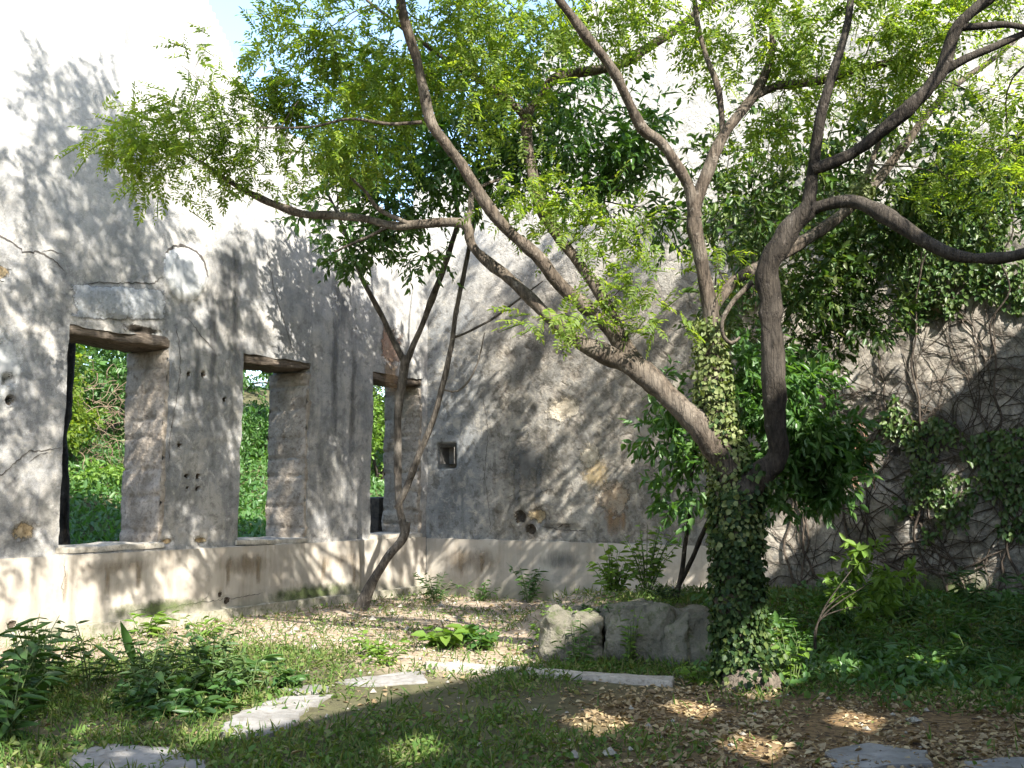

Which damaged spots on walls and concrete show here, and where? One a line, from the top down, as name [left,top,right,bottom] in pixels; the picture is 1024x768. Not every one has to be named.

crack [0,235,162,290]
crack [0,448,58,476]
spalling [577,441,633,519]
spalling [10,521,41,543]